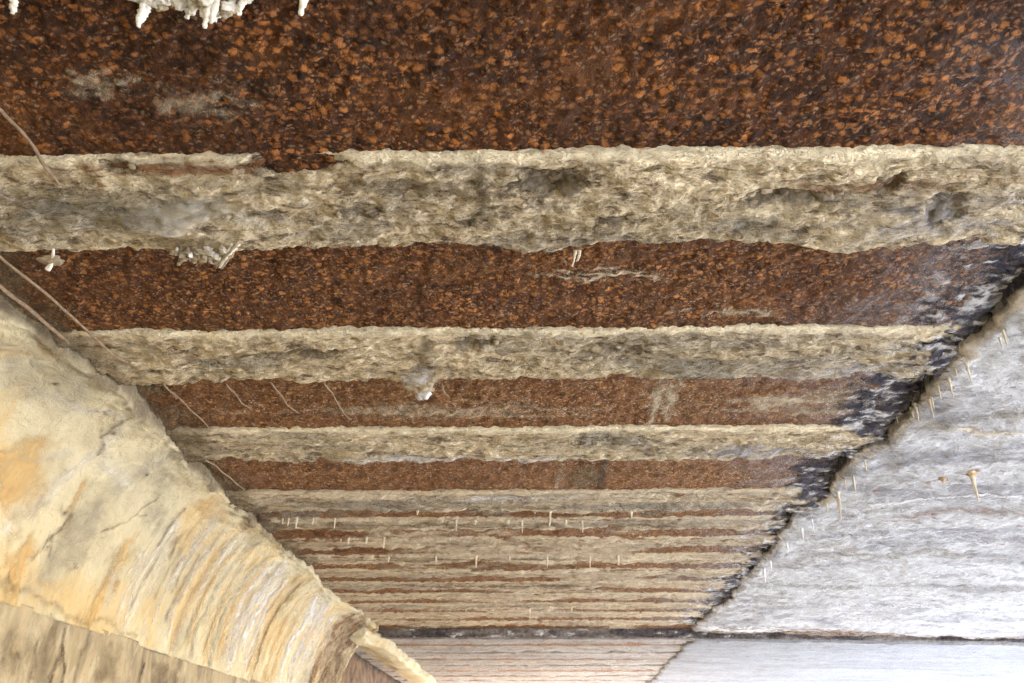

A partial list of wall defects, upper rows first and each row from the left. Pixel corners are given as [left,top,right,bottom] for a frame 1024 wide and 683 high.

leakage [9,0,19,14]
leakage [129,0,253,29]
leakage [298,0,309,16]
rust [79,151,266,177]
leakage [612,235,1024,640]
rust [515,509,575,522]
rust [273,529,388,559]
rust [476,564,575,572]
leakage [384,628,517,638]